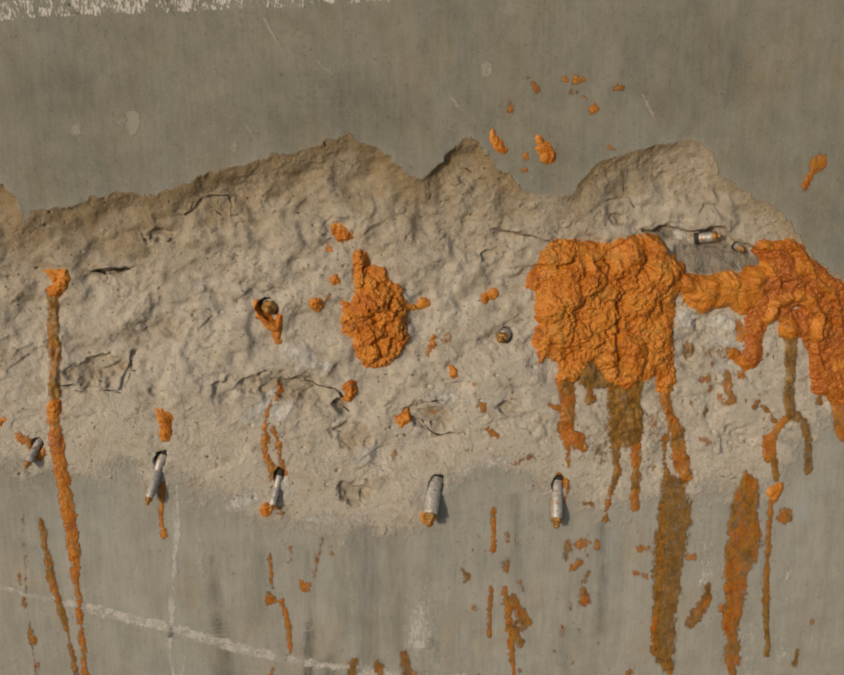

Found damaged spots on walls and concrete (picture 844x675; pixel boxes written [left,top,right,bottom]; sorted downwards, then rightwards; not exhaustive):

crack [184,194,232,220]
spalling [0,133,844,537]
rust [261,381,288,482]
rust [815,396,844,442]
rust [14,269,89,675]
rust [259,496,285,517]
rust [489,506,510,553]
rust [633,337,813,675]
rust [486,581,532,675]
rust [347,658,359,675]
rust [374,661,385,675]
rust [400,651,418,675]